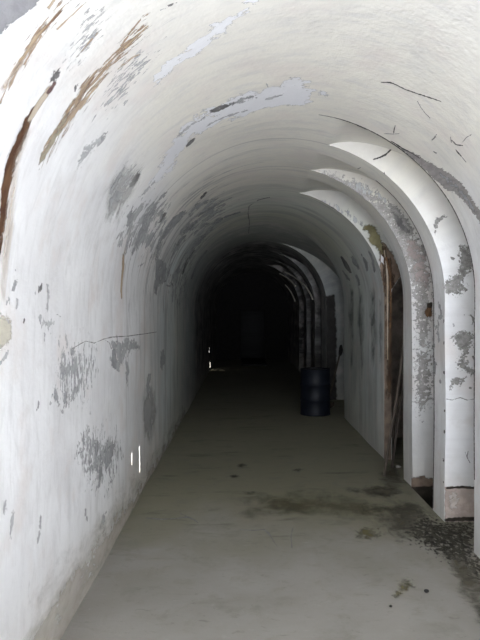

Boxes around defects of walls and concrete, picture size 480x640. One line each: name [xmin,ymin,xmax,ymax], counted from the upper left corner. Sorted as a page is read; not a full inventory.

corrosion [0,0,83,104]
corrosion [39,14,148,165]
crack [381,82,441,118]
corrosion [0,69,60,253]
peeling [109,77,328,304]
peeling [322,171,445,423]
crack [322,115,475,480]
spalling [444,245,473,296]
peeling [50,335,99,414]
spalling [449,314,474,390]
leakage [411,476,433,509]
leakage [444,550,480,616]